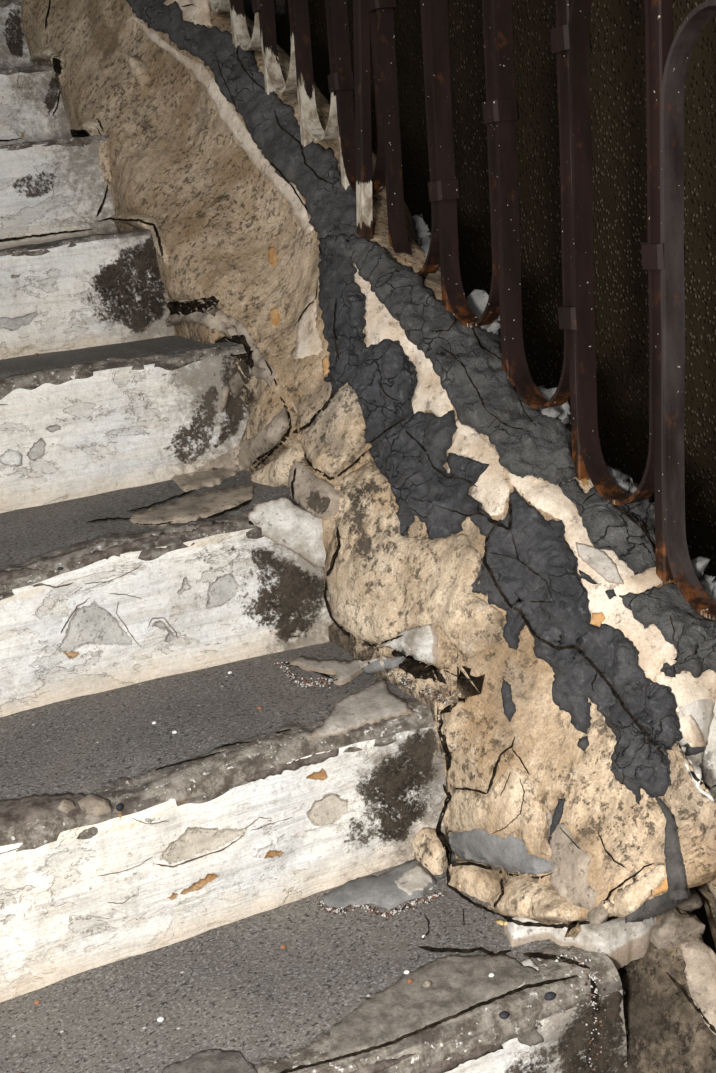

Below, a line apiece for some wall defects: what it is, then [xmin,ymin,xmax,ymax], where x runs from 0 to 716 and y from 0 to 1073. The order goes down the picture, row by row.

peeling [132,16,313,236]
mould [87,235,166,333]
mould [163,356,255,464]
peeling [83,484,255,564]
peeling [354,264,716,803]
mould [198,547,327,642]
peeling [290,622,439,740]
spalling [242,748,339,782]
mould [344,729,439,853]
crack [280,527,654,1073]
spalling [330,954,539,1058]
damp [505,982,667,1073]